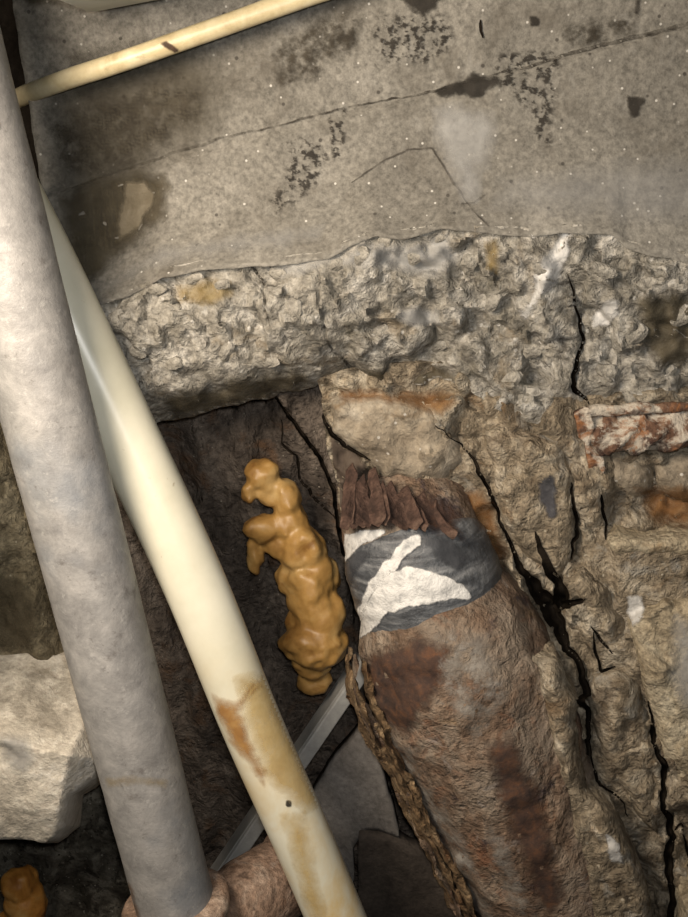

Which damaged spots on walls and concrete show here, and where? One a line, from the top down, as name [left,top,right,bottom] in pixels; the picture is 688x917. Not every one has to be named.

mould [373,0,451,63]
mould [436,52,558,143]
damp [57,61,207,277]
crack [352,148,489,226]
efflorescence [522,233,571,318]
crack [567,274,589,405]
spalling [101,221,688,744]
spalling [114,489,253,868]
crack [435,425,628,816]
spalling [305,704,358,786]
spalling [386,772,418,839]
crack [647,701,688,917]